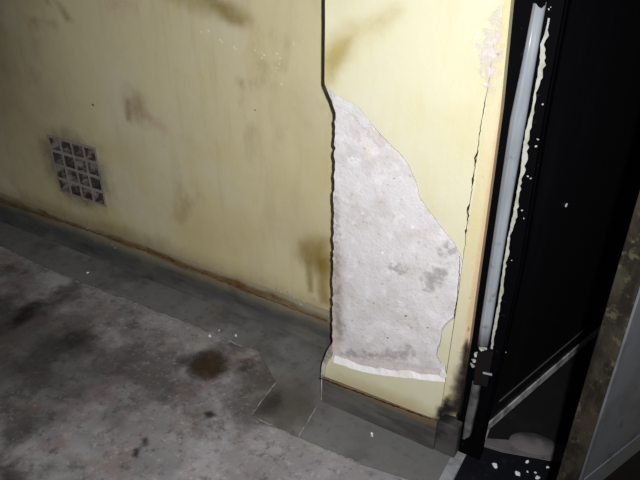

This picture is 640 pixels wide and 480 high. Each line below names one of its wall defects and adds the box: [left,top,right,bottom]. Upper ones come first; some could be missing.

flaking render [325,85,462,382]
crack [454,46,494,316]
leakage [436,343,468,420]